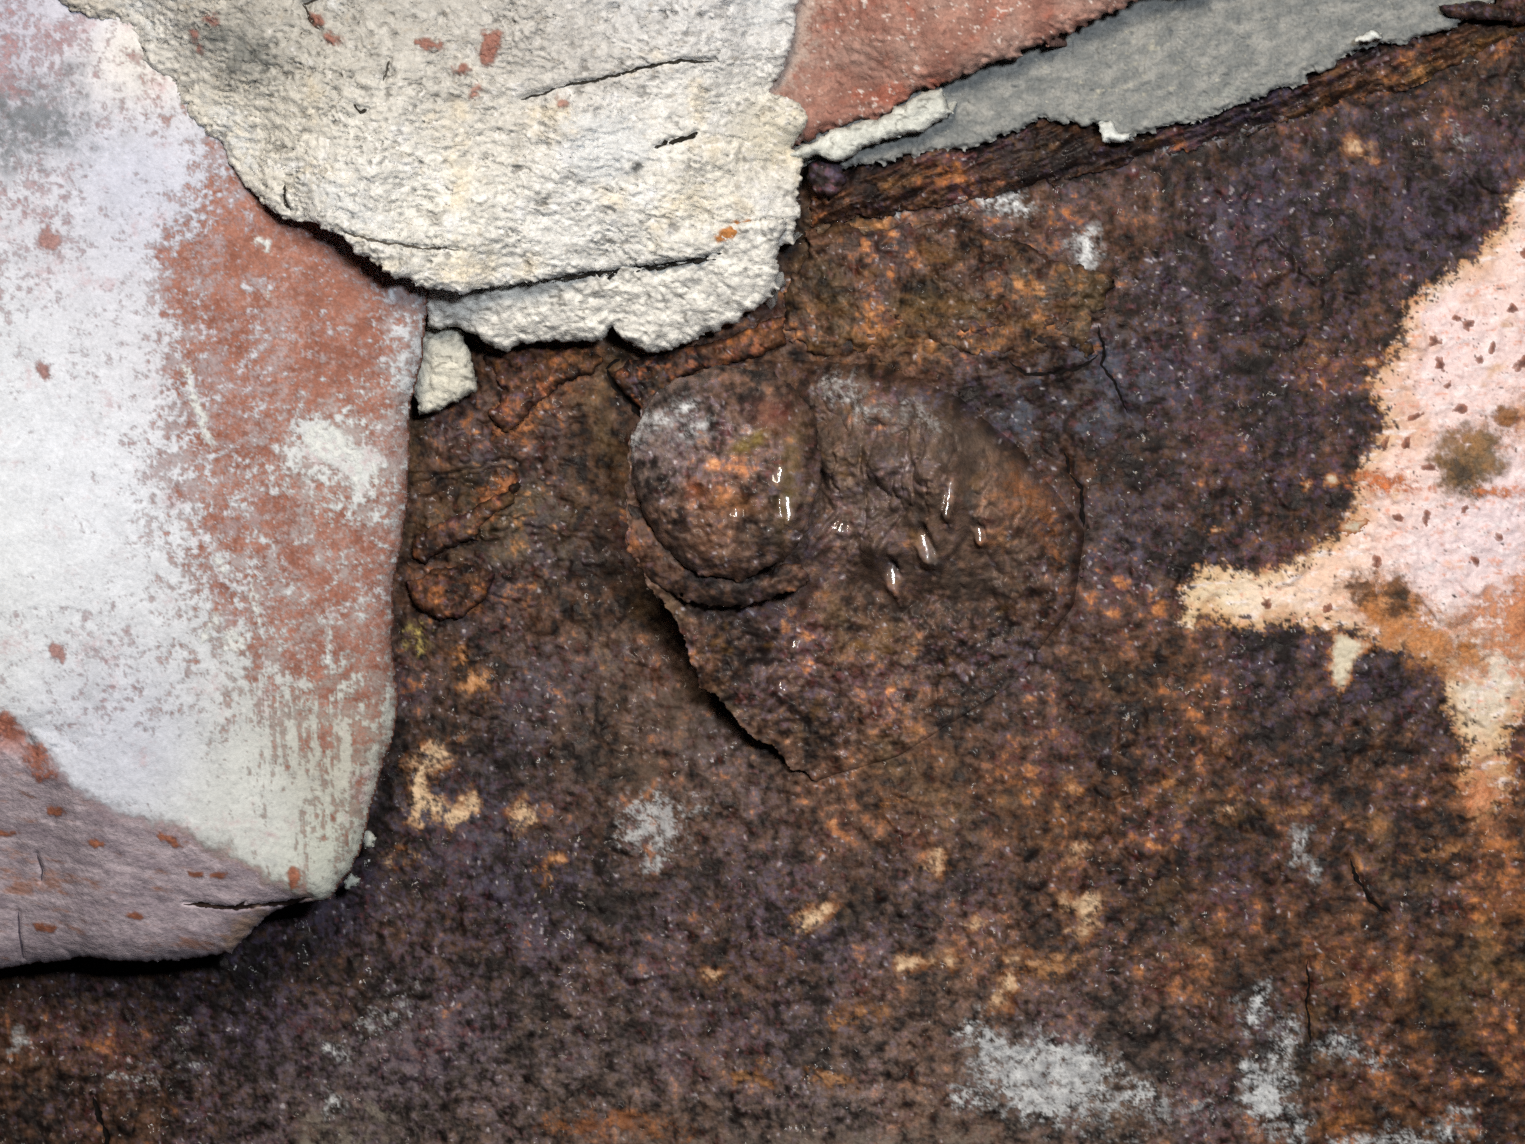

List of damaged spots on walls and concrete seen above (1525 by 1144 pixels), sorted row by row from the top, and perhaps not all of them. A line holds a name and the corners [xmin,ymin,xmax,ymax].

spalling [414,38,442,50]
spalling [457,29,502,97]
crack [521,59,714,100]
peeling [1344,133,1364,156]
corrosion [715,220,751,242]
crack [605,358,641,417]
corrosion [483,316,787,439]
peeling [0,0,429,900]
corrosion [1428,405,1525,498]
corrosion [406,472,522,621]
peeling [1177,179,1525,829]
corrosion [1345,572,1525,677]